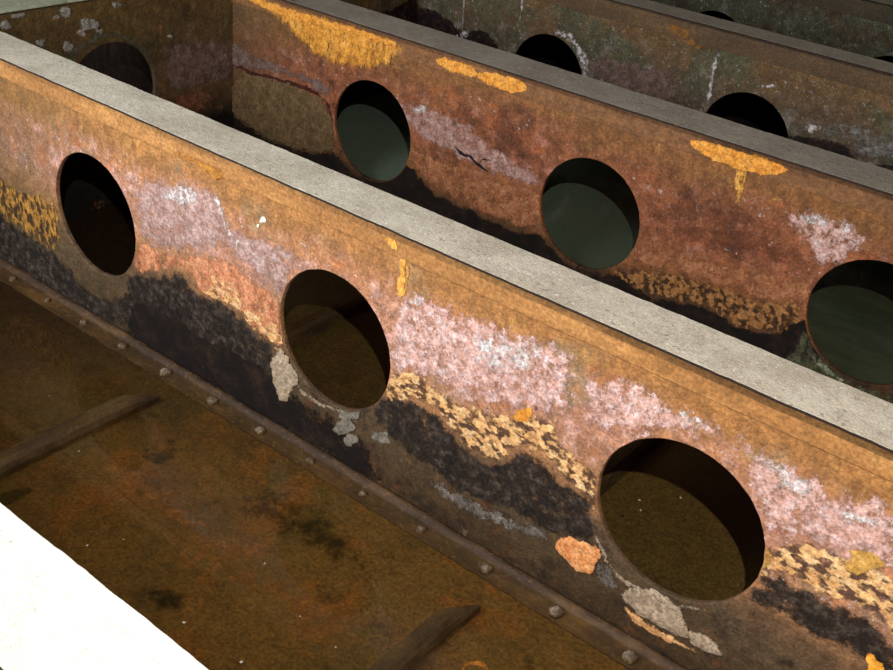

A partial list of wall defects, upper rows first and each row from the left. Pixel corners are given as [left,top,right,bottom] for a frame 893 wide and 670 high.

spalling [383,0,504,51]
damp [214,103,576,271]
crack [456,148,490,172]
rust [134,241,283,350]
peeling [270,349,298,401]
damp [390,292,573,415]
damp [590,274,893,404]
rust [386,372,597,503]
damp [732,434,893,567]
rust [555,536,637,588]
peeling [621,586,722,656]
rust [760,543,893,634]